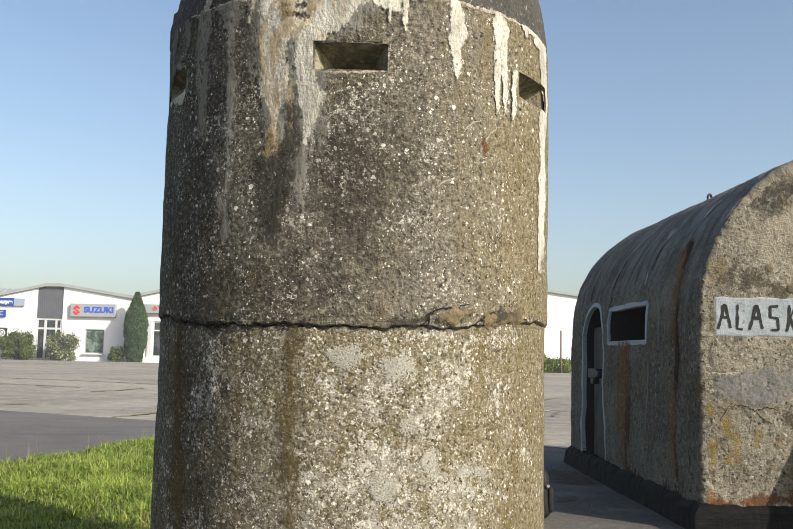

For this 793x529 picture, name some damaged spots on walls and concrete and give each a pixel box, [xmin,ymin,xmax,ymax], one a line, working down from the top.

leakage [448,0,468,79]
leakage [492,12,518,119]
leakage [173,0,425,245]
leakage [522,25,548,274]
crack [160,304,542,331]
spalling [389,314,426,330]
spalling [438,305,524,329]
corrosion [669,240,694,483]
crack [720,404,778,430]